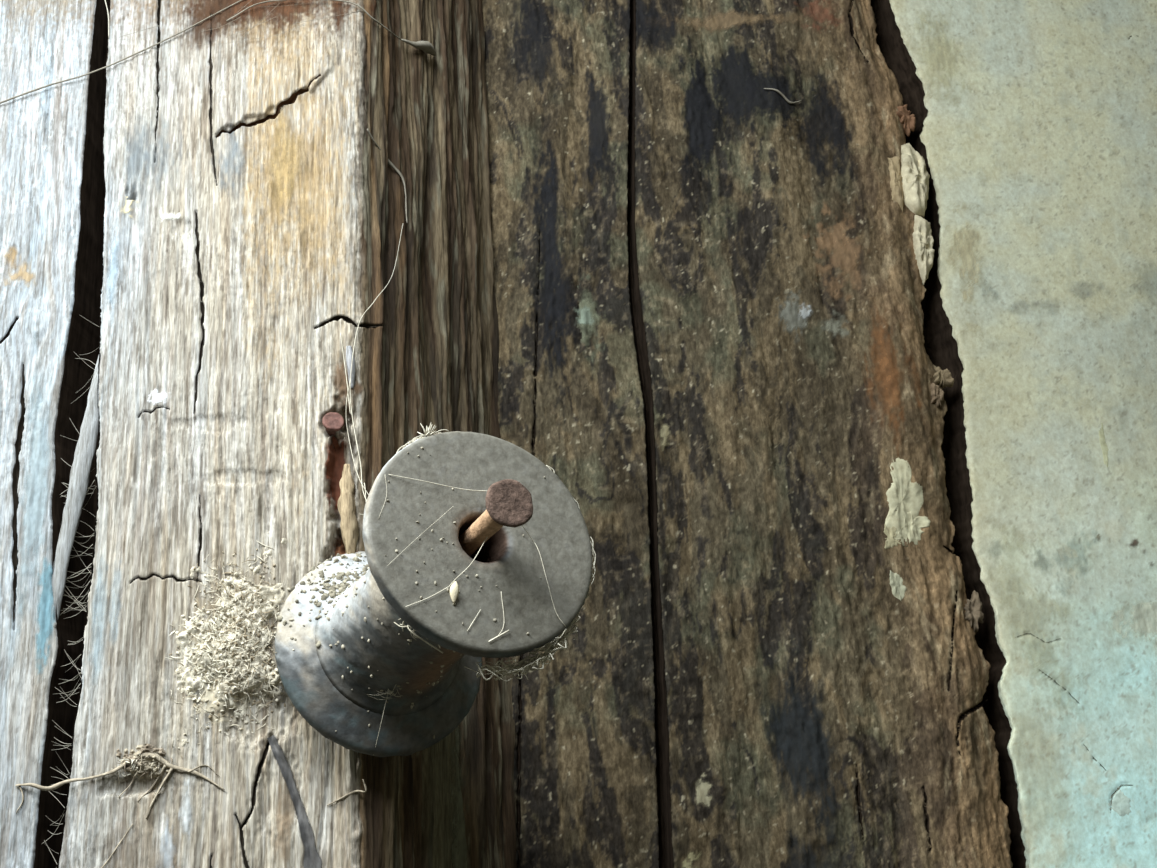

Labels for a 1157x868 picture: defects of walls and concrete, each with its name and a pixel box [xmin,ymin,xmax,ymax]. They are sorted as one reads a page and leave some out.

crack [209,13,321,185]
crack [0,317,19,344]
crack [138,211,204,418]
corrosion [325,435,346,511]
corrosion [335,536,357,557]
corrosion [334,364,362,412]
crack [628,0,673,868]
peeling [884,457,931,549]
crack [848,0,1079,868]
crack [235,741,269,868]